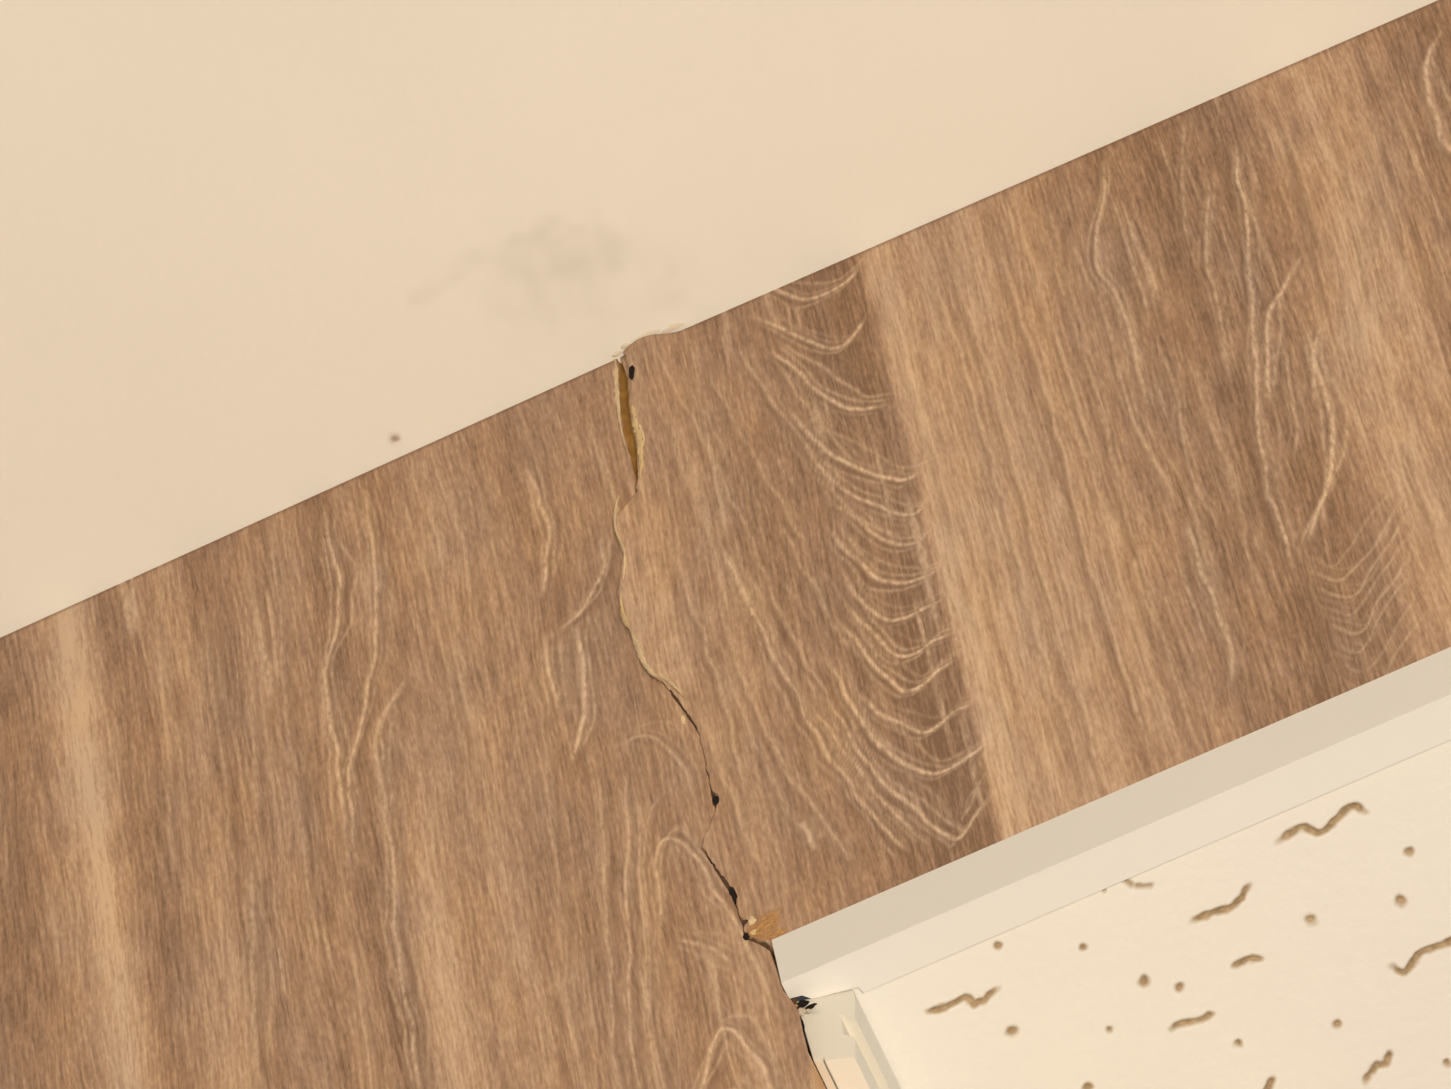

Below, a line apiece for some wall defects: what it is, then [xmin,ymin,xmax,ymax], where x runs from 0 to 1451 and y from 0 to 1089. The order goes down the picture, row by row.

crack [613,359,645,492]
crack [670,690,699,734]
crack [706,770,719,808]
crack [706,852,778,968]